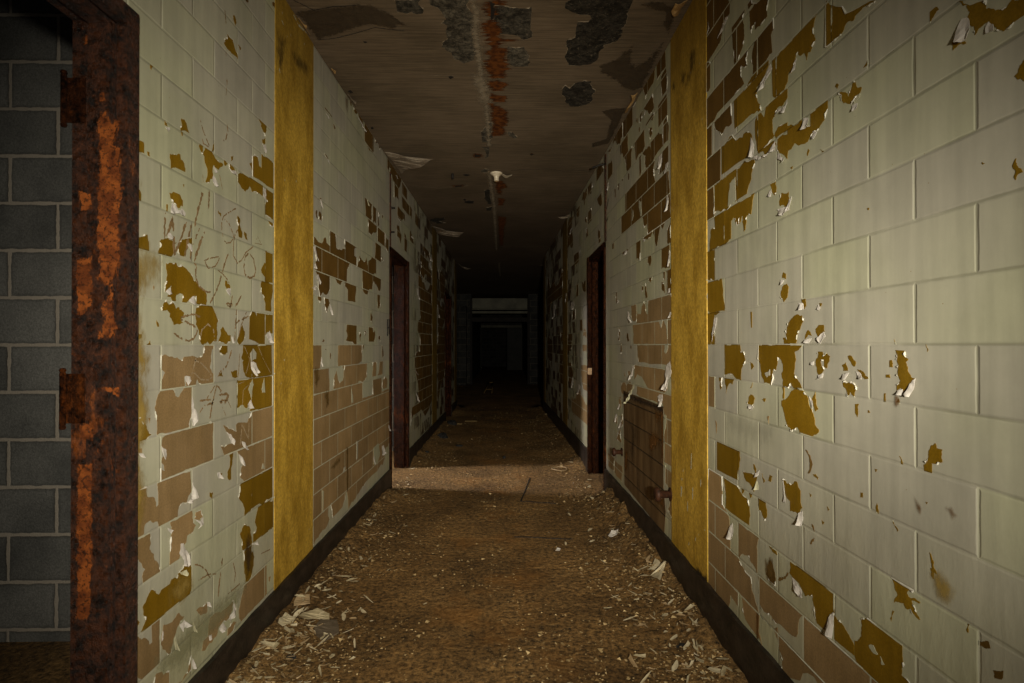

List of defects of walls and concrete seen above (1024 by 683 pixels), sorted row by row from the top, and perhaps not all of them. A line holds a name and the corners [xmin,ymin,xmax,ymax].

rust [76,92,123,339]
peeling [137,233,276,683]
peeling [199,119,274,227]
peeling [313,106,445,545]
rust [480,0,515,136]
spalling [565,0,633,66]
peeling [562,52,672,517]
peeling [706,0,876,437]
peeling [708,421,910,683]
peeling [884,341,916,404]
peeling [924,443,942,473]
peeling [952,0,1024,50]